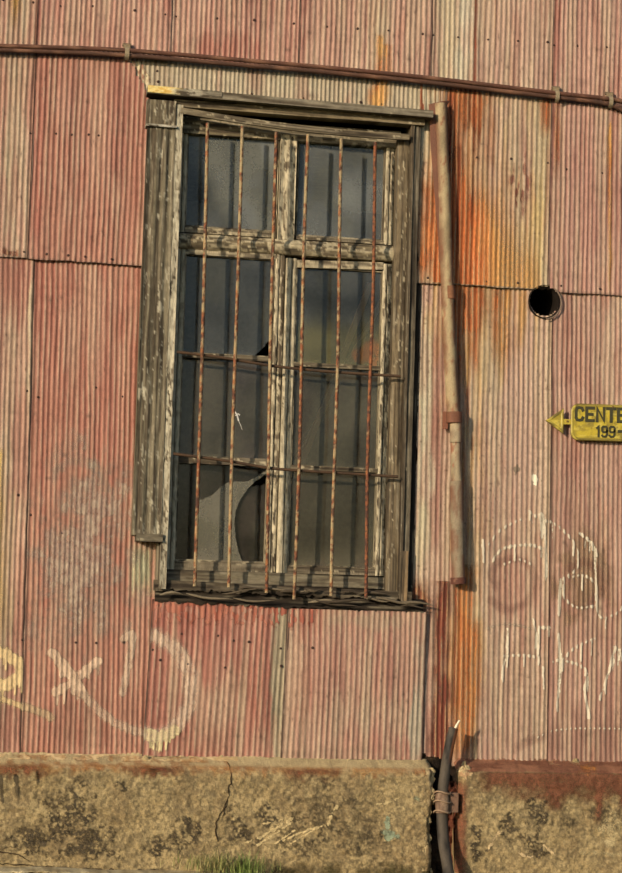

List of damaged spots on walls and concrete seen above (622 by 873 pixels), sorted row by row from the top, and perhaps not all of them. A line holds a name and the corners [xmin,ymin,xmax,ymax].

corrosion [419,0,535,412]
corrosion [413,565,479,759]
leakage [0,774,19,803]
leakage [5,776,120,861]
corrosion [114,765,182,776]
leakage [143,816,202,857]
crack [215,761,233,840]
leakage [471,825,487,862]
leakage [500,798,574,859]
leakage [467,758,622,774]
leakage [589,809,622,847]